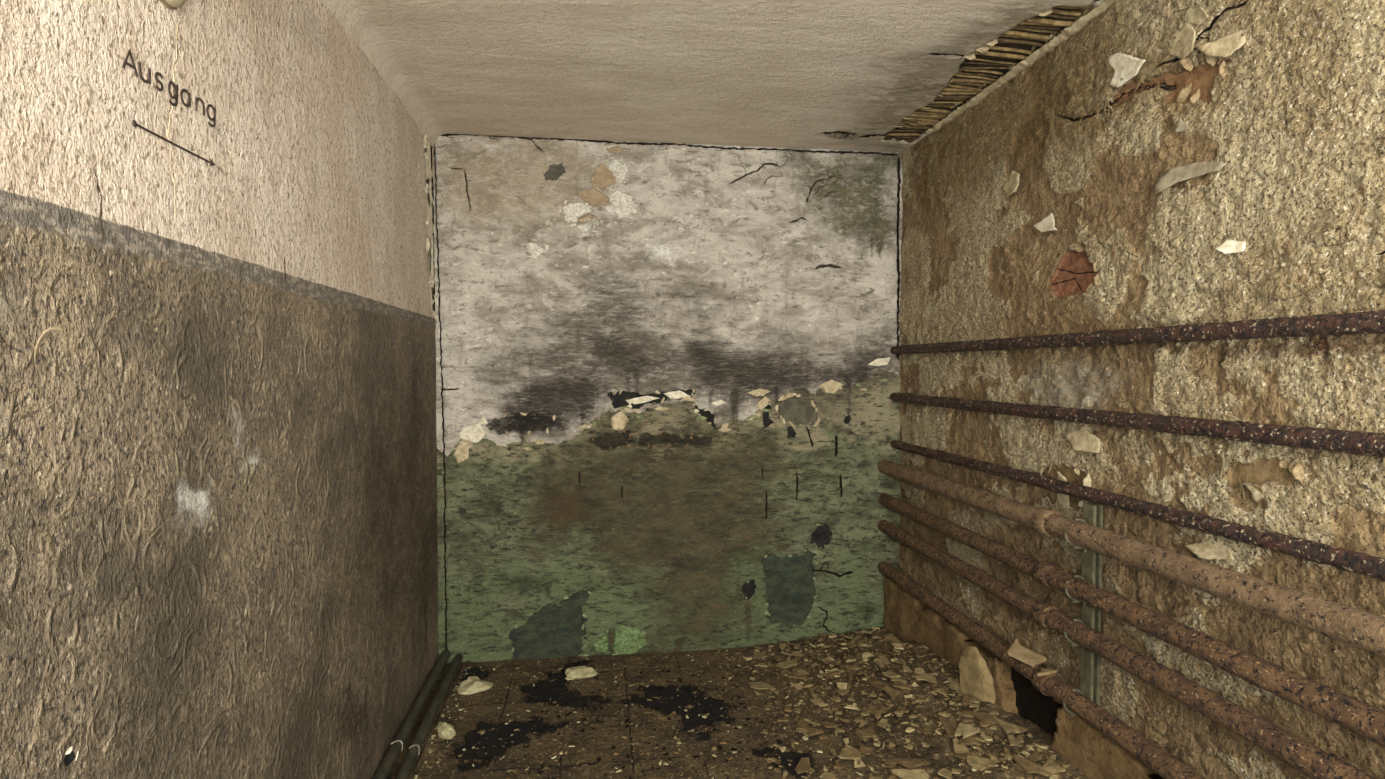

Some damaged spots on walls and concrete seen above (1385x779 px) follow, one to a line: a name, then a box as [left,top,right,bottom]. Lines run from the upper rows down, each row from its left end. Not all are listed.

peeling [895,0,1119,134]
crack [1056,0,1251,121]
flaking render [1103,7,1246,132]
damp [476,281,896,652]
flaking render [1035,463,1092,510]
peeling [1063,428,1101,453]
flaking render [1219,456,1304,499]
peeling [1184,539,1235,560]
spalling [993,657,1063,737]